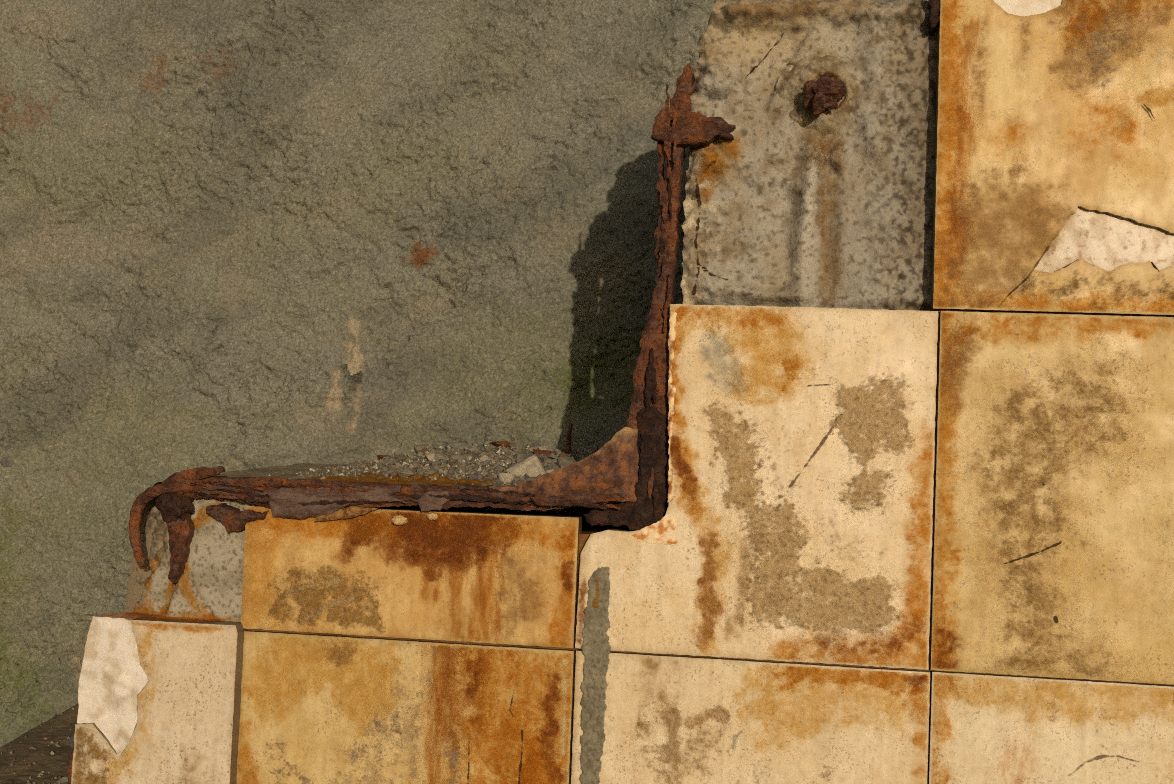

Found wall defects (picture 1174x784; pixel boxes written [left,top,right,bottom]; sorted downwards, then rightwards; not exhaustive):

spalling [993,0,1062,16]
spalling [1034,207,1174,274]
rust [128,63,736,585]
spalling [77,613,150,757]